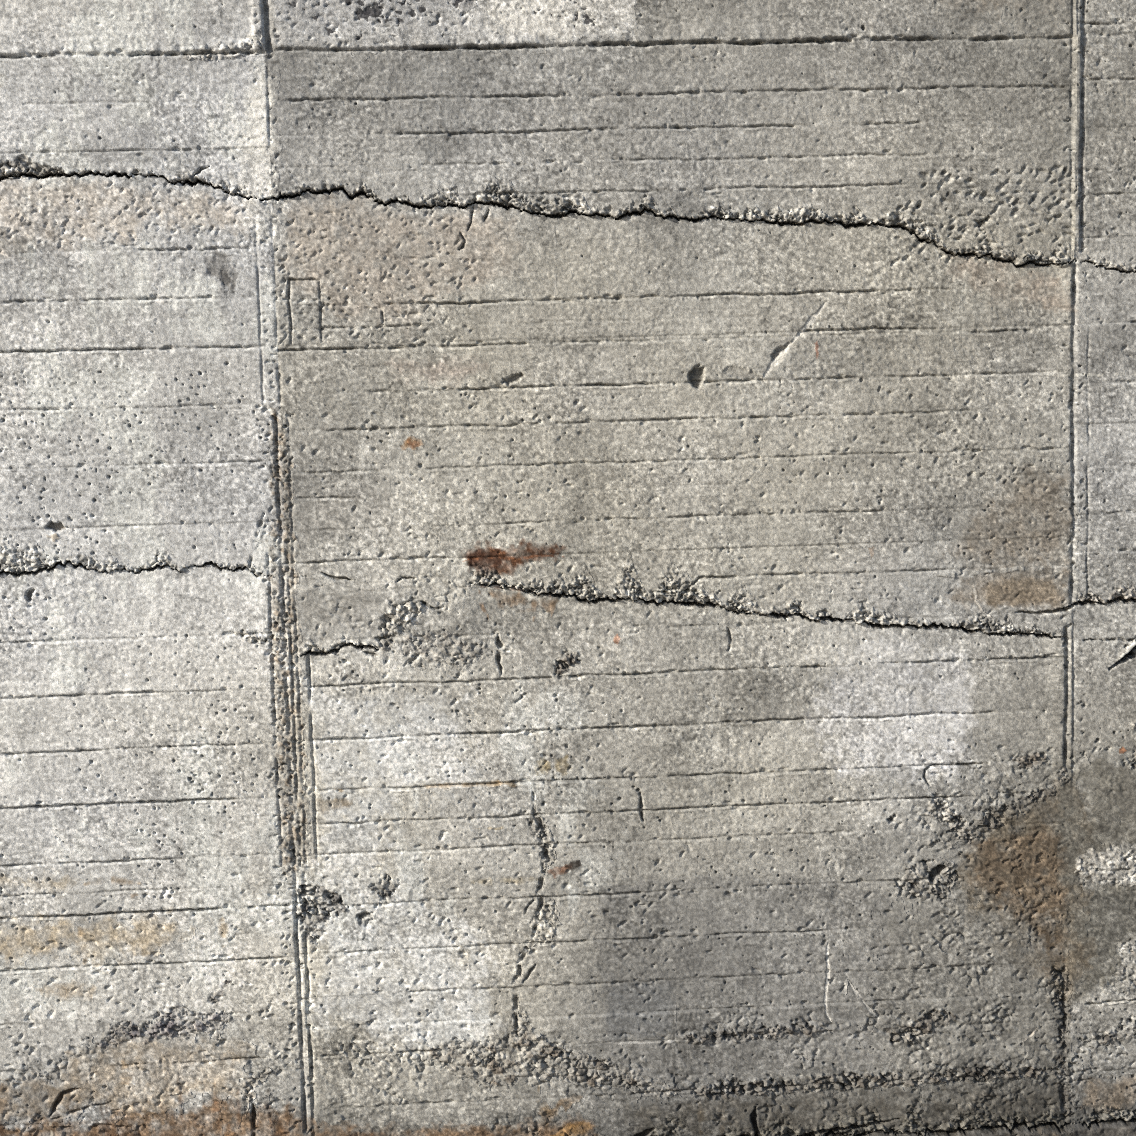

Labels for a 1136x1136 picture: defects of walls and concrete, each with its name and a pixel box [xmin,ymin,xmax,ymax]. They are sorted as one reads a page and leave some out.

crack [0,164,1136,274]
crack [287,278,323,344]
crack [0,535,270,578]
crack [324,573,352,581]
crack [301,577,443,666]
crack [496,634,504,676]
rust [460,536,568,622]
crack [467,552,1136,649]
water stain [594,748,1136,1136]
rust [0,1023,599,1136]
crack [799,1117,1136,1136]